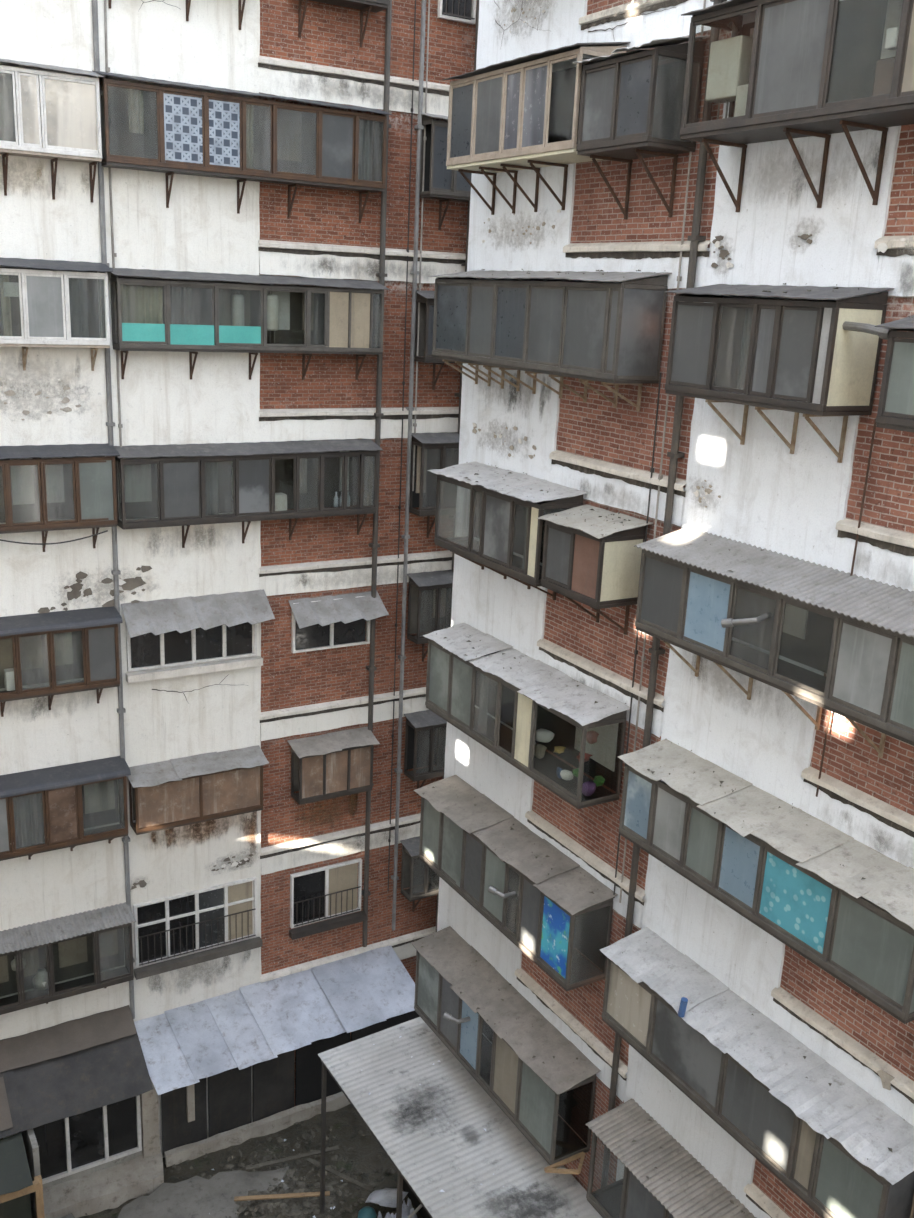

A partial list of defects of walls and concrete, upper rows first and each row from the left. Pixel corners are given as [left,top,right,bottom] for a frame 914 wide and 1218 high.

peeling [877,238,912,253]
peeling [37,566,152,613]